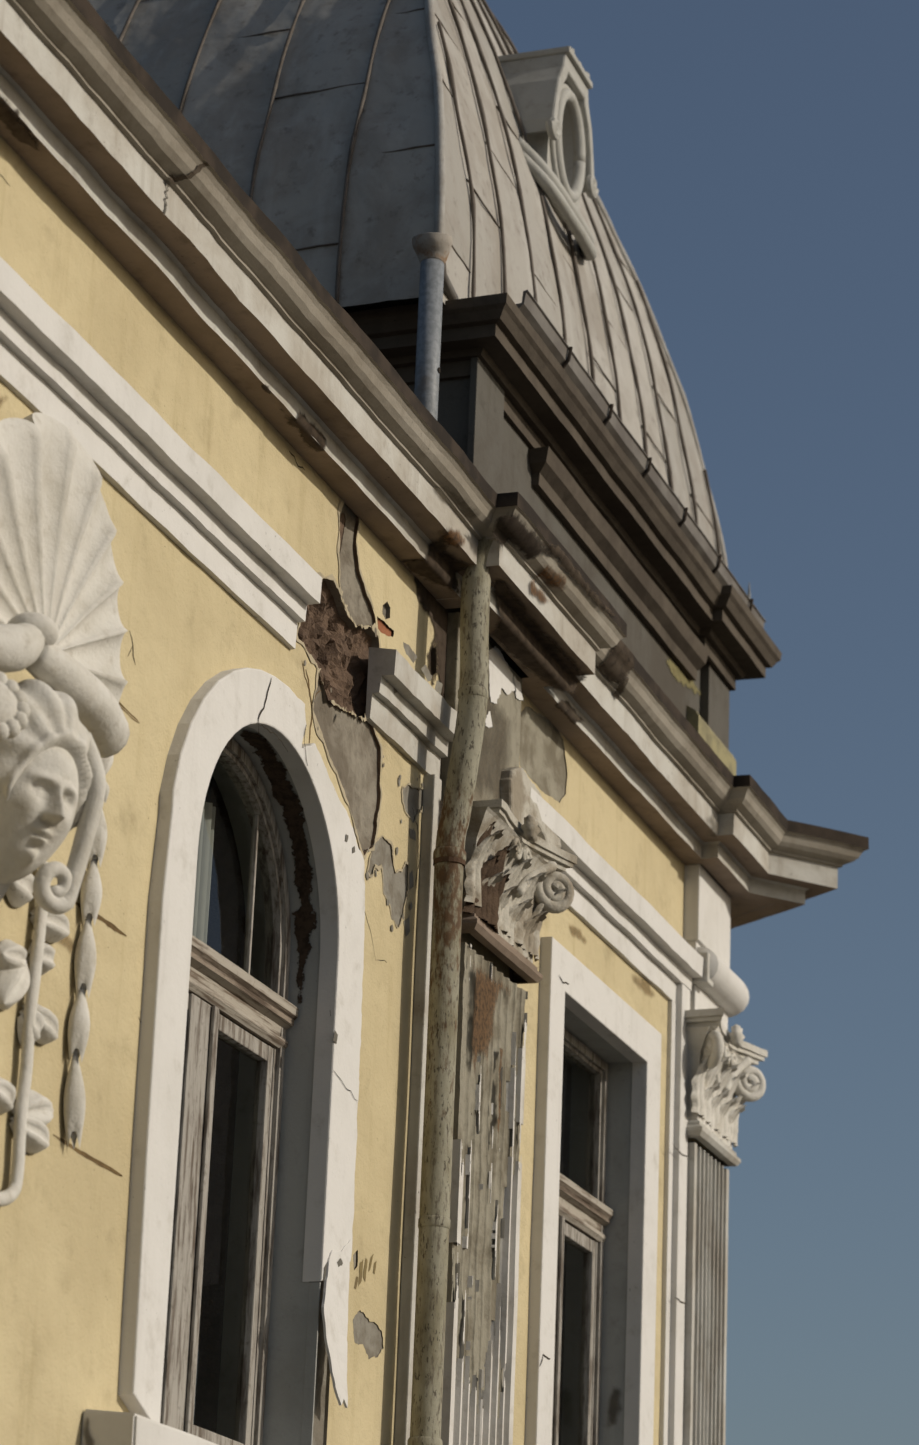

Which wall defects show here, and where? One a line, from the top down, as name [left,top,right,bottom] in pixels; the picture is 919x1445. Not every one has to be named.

crack [258,662,321,766]
flaking render [296,499,443,936]
flaking render [485,646,567,803]
peeling [240,730,318,1004]
rust [472,962,511,1133]
peeling [446,942,526,1418]
peeling [300,1240,384,1445]